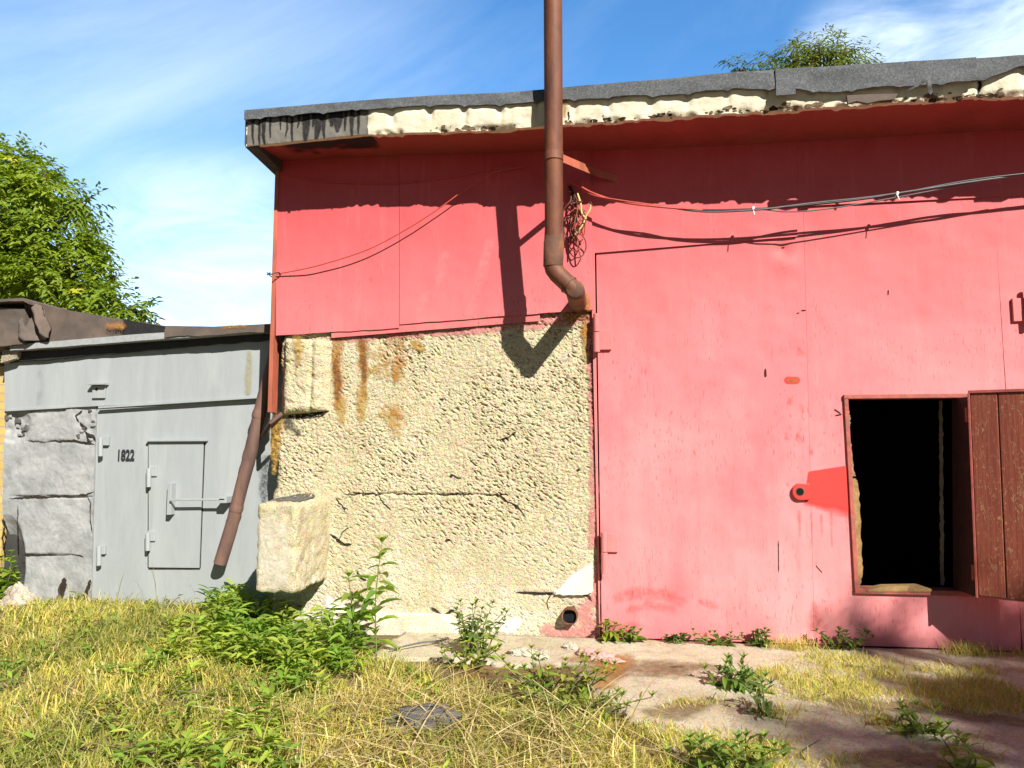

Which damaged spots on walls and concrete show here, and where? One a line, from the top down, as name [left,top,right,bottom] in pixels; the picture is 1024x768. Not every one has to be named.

spalling [881,88,1005,103]
spalling [565,115,636,125]
spalling [649,101,825,119]
leakage [247,110,377,154]
corrosion [332,333,425,424]
spalling [4,414,30,436]
corrosion [379,407,403,437]
crack [330,474,525,546]
crack [516,591,556,610]